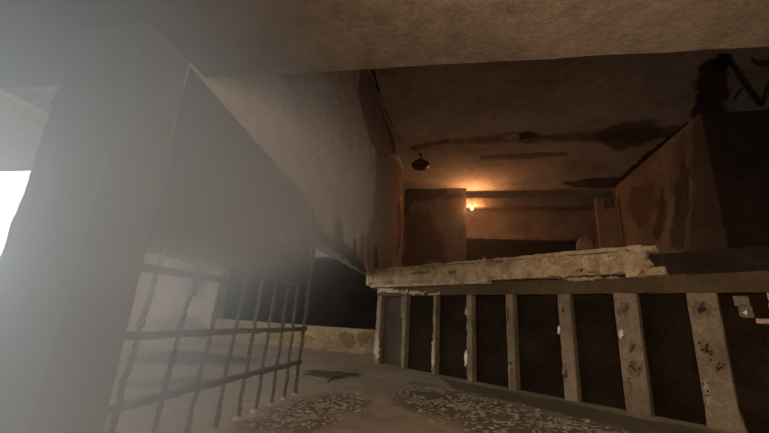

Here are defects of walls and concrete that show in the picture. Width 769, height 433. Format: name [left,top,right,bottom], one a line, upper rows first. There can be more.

water stain [564,53,769,188]
flaking render [626,245,669,278]
flaking render [733,296,769,324]